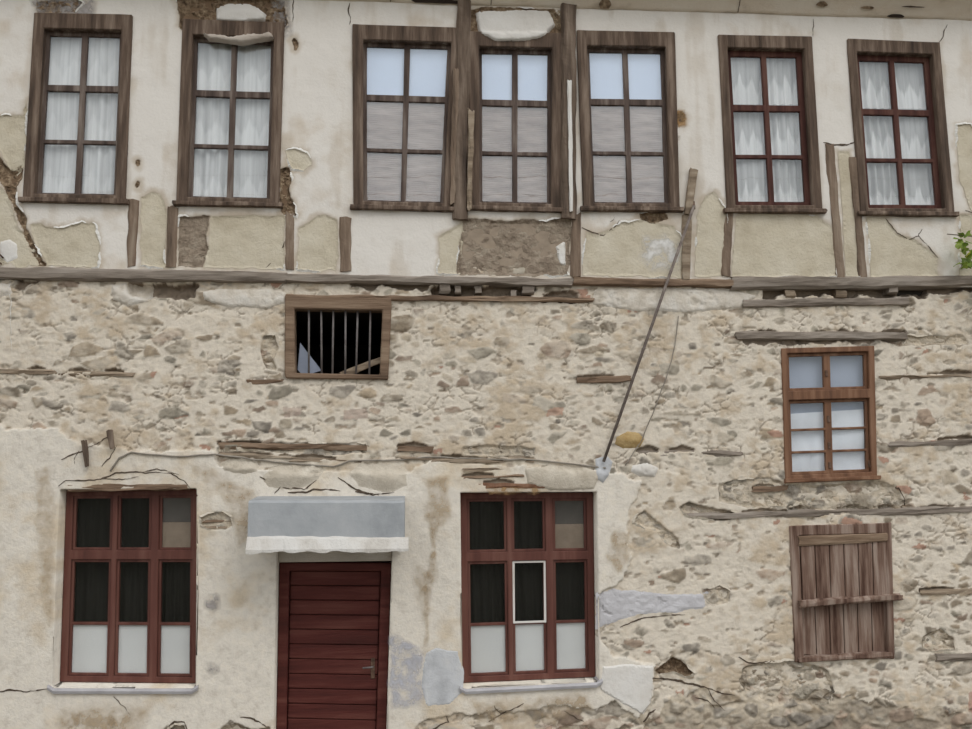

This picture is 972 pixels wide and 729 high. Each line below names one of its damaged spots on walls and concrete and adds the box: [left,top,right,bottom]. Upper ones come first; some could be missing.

flaking render [0,106,101,268]
flaking render [135,147,339,273]
flaking render [436,212,683,279]
flaking render [694,151,938,277]
crack [886,219,936,255]
flaking render [954,122,972,276]
crack [59,437,190,488]
flaking render [199,511,234,530]